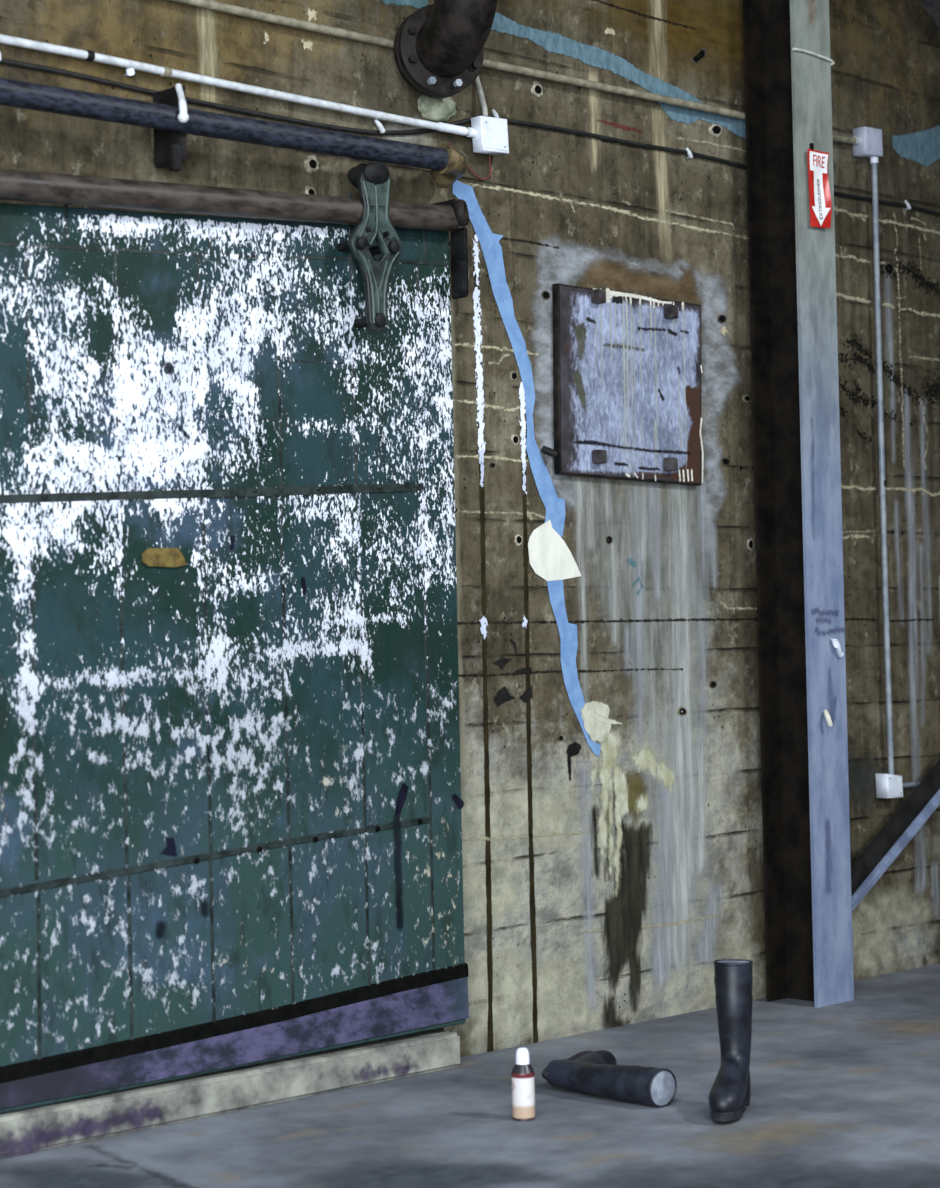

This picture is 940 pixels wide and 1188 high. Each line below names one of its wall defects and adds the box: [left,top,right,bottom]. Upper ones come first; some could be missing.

corrosion [584,260,699,303]
leakage [601,299,656,453]
peeling [0,212,457,882]
leakage [585,484,705,1029]
peeling [18,876,142,965]
peeling [66,925,234,1042]
peeling [172,876,205,902]
peeling [331,937,399,982]
crack [98,1161,194,1188]